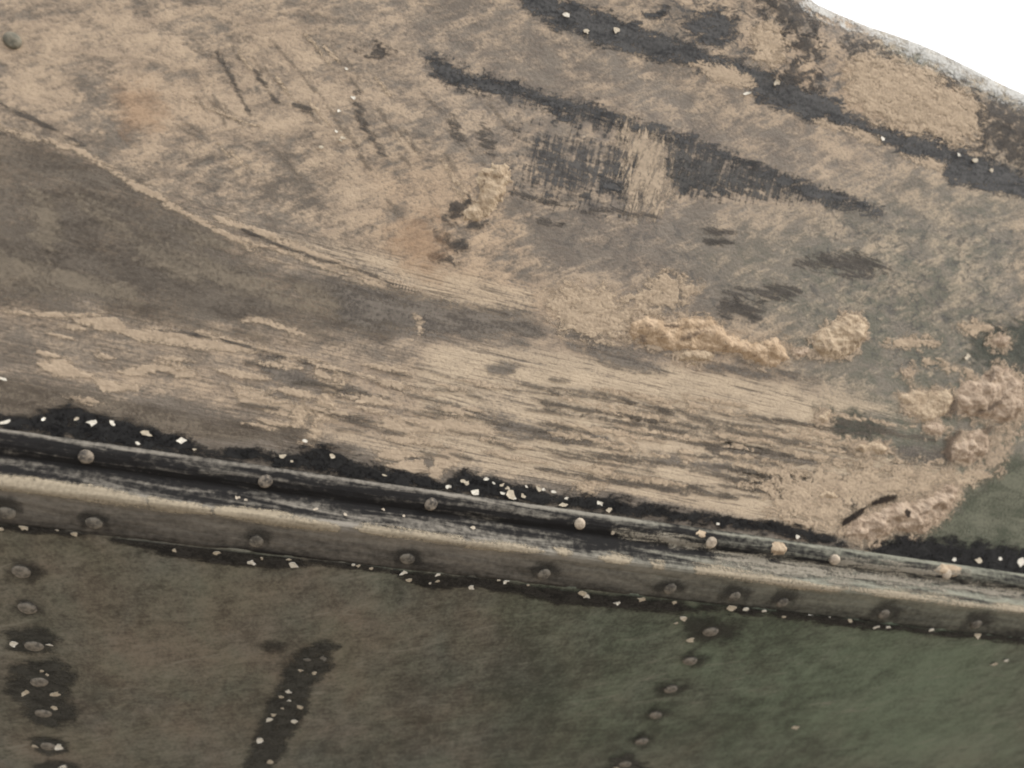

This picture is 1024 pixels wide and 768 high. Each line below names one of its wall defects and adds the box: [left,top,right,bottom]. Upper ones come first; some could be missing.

water stain [13,562,43,583]
water stain [0,377,351,451]
peeling [0,398,1024,574]
water stain [241,355,948,499]
crack [841,494,911,526]
water stain [3,627,78,768]
water stain [243,640,342,768]